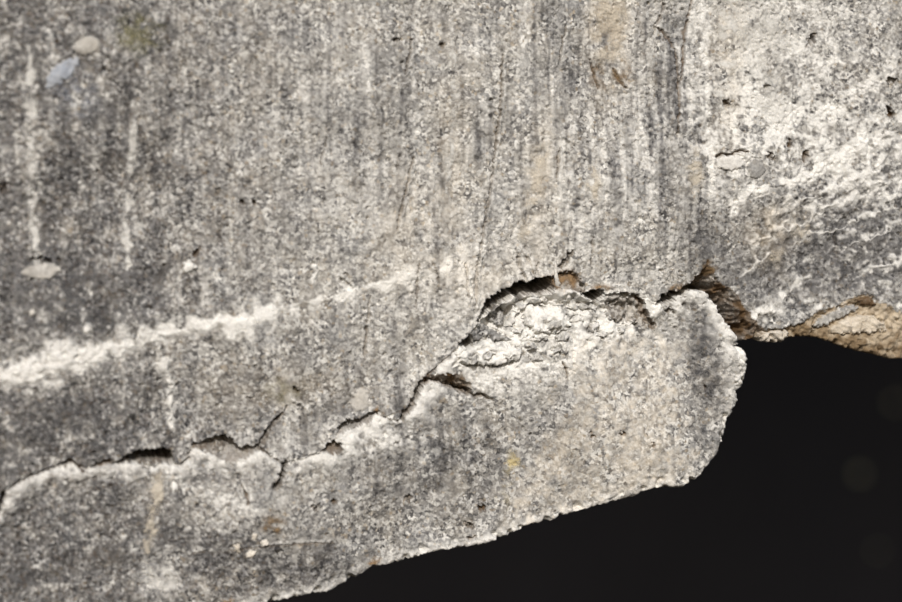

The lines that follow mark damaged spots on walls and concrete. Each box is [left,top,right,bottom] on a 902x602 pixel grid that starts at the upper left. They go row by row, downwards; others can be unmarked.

crack [0,54,605,515]
spalling [0,290,747,602]
crack [655,260,766,344]
spalling [752,294,902,359]